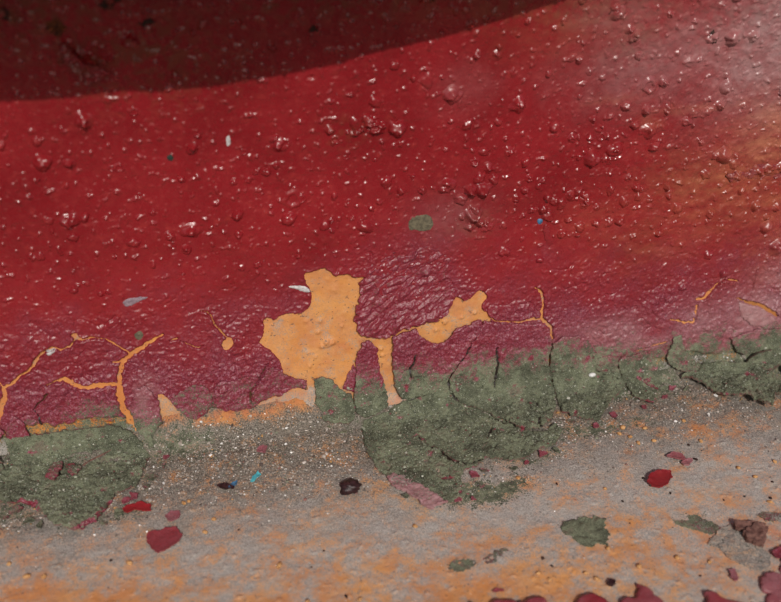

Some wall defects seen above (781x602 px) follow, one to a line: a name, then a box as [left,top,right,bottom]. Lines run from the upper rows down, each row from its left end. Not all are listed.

crack [670,279,777,324]
crack [480,287,553,387]
peeling [666,303,781,406]
crack [0,334,201,435]
peeling [0,246,660,530]
crack [447,347,470,409]
peeling [667,451,693,466]
peeling [576,593,608,602]
peeling [620,584,664,602]
peeling [703,591,738,602]
peeling [759,571,781,594]